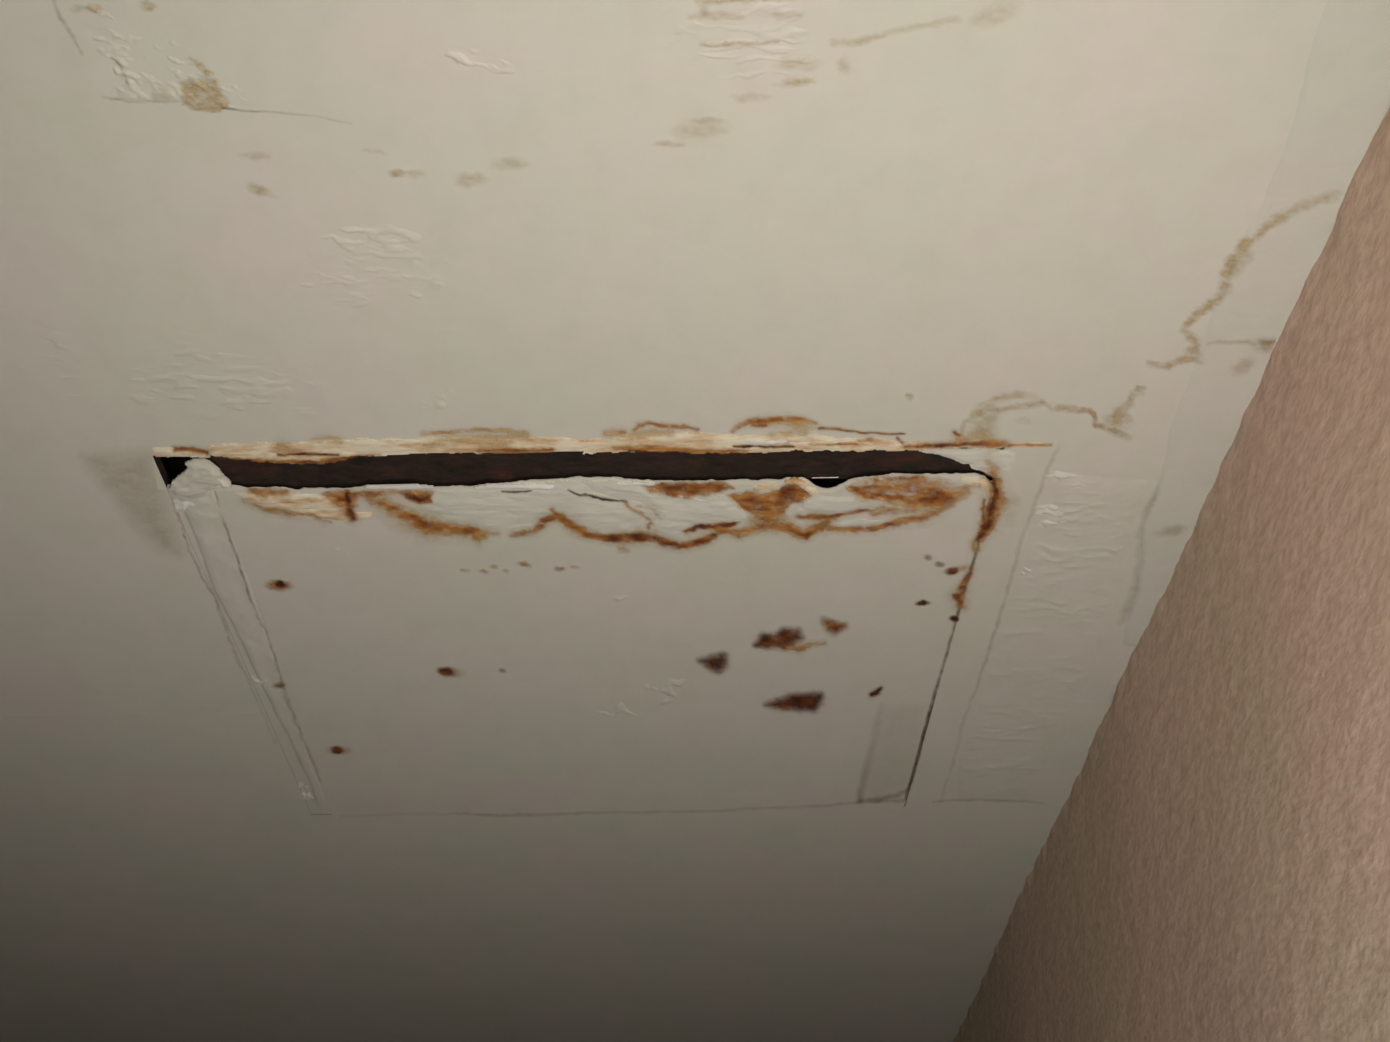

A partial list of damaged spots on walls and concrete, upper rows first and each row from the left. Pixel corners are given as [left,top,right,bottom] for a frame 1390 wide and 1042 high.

damp [1168,221,1277,367]
rust [428,428,554,453]
rust [604,416,1050,454]
peeling [152,432,1053,527]
rust [325,490,492,542]
peeling [366,479,747,536]
rust [511,475,969,549]
rust [973,466,1007,551]
rust [947,568,970,622]
rust [754,620,846,651]
rust [700,654,727,672]
rust [767,694,822,710]